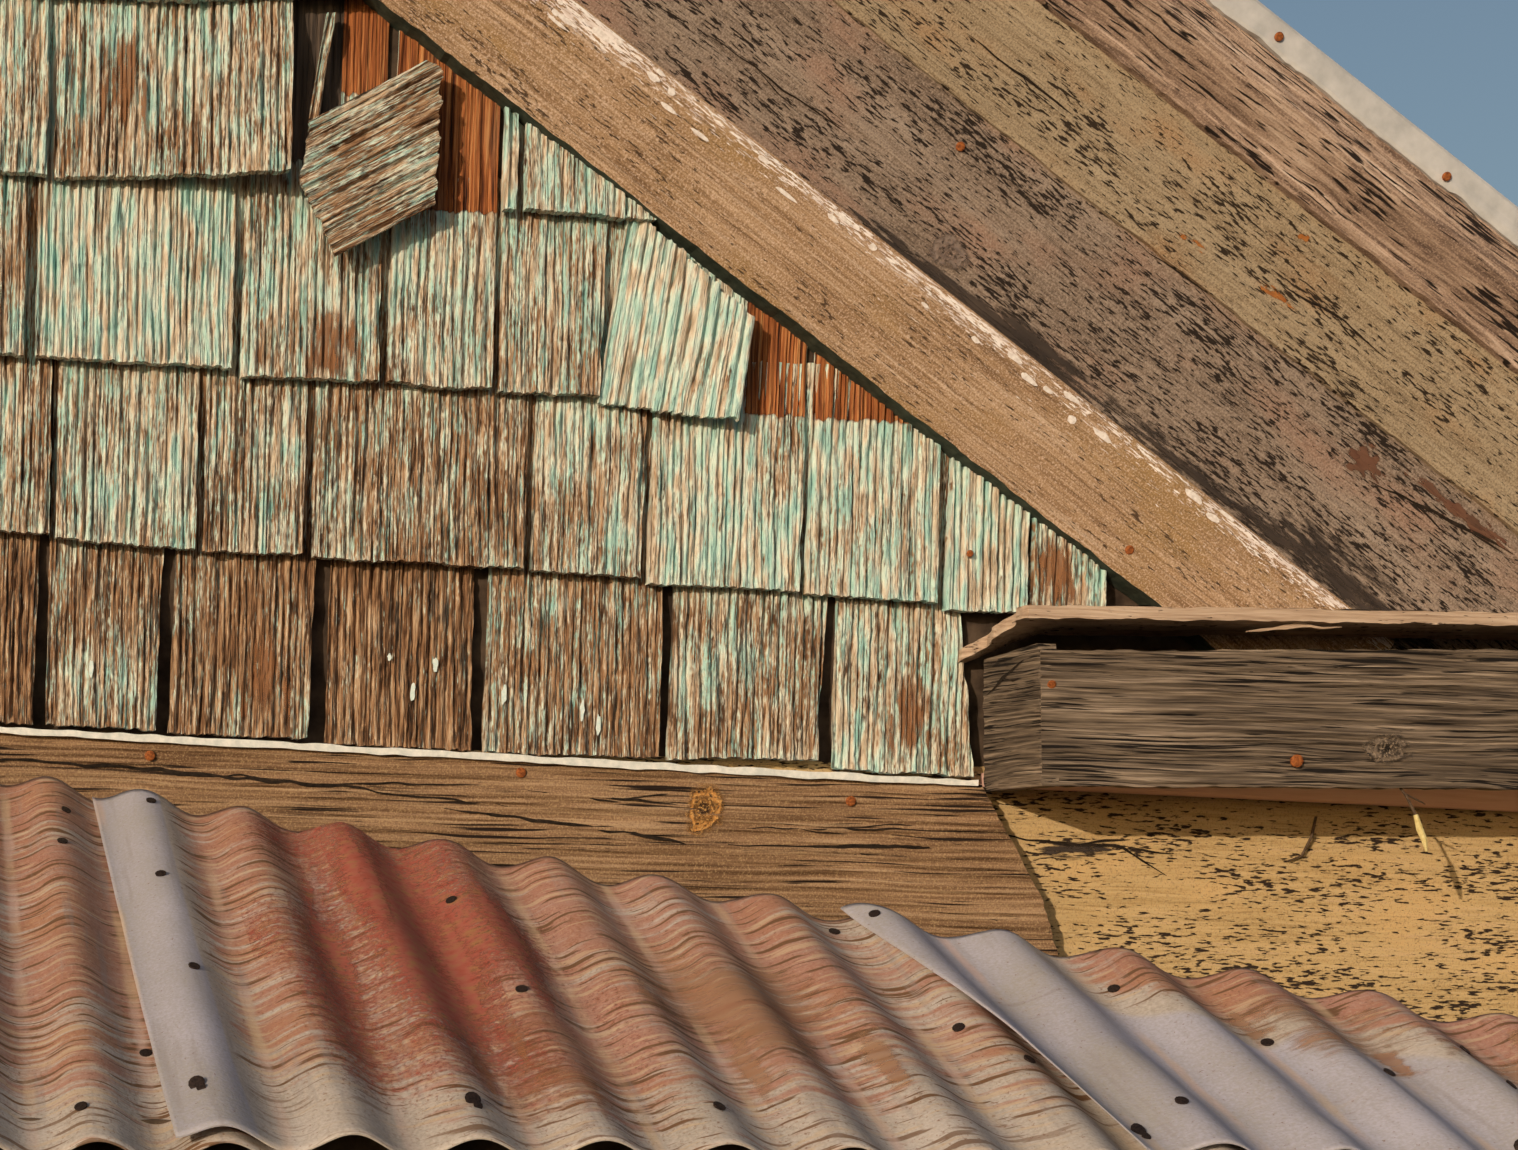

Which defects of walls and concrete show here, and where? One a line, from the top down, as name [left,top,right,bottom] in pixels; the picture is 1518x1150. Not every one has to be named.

peeling [291,0,500,215]
peeling [528,0,1349,610]